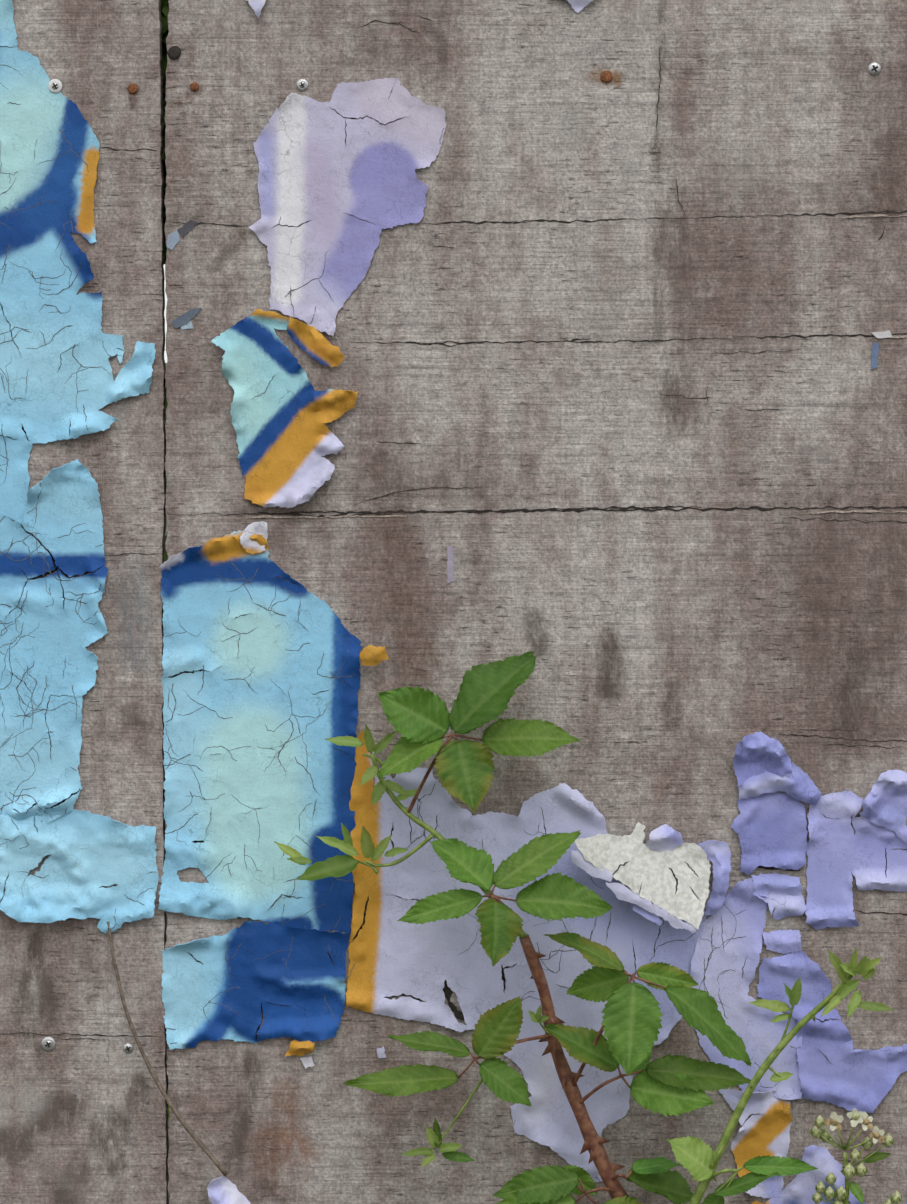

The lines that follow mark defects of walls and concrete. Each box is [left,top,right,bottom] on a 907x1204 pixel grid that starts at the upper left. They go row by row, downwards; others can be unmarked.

crack [654,52,662,129]
crack [167,220,240,228]
crack [424,180,907,248]
crack [349,333,907,354]
crack [167,486,907,523]
peeling [0,0,602,1182]
peeling [383,731,907,1110]
peeling [562,1047,633,1137]
peeling [731,1007,907,1177]
peeling [746,1145,867,1204]